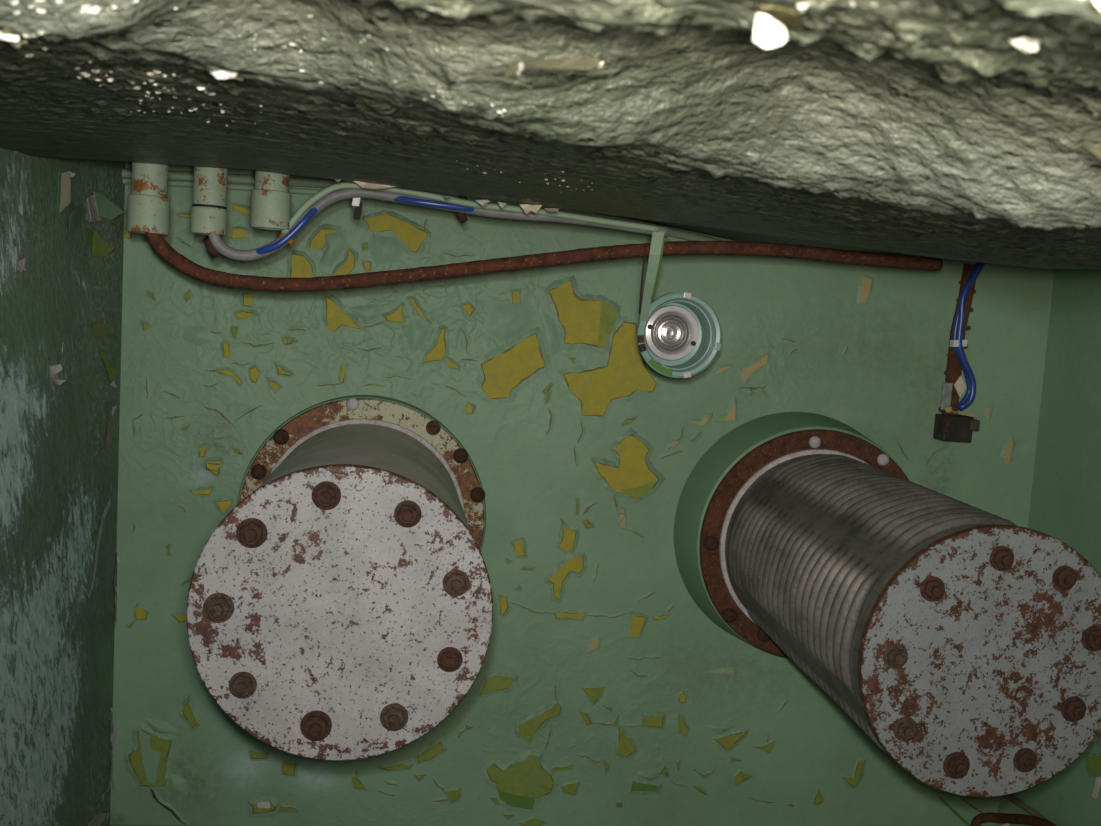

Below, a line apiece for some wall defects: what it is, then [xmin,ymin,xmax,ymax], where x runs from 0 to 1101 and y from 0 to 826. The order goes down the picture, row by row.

peeling [286,223,342,278]
peeling [331,210,431,276]
peeling [216,292,295,394]
peeling [321,291,366,336]
peeling [382,296,461,372]
peeling [464,275,673,421]
peeling [591,415,665,529]
peeling [498,537,535,617]
peeling [544,498,596,622]
peeling [481,700,580,826]
peeling [579,684,639,774]
peeling [710,728,776,786]